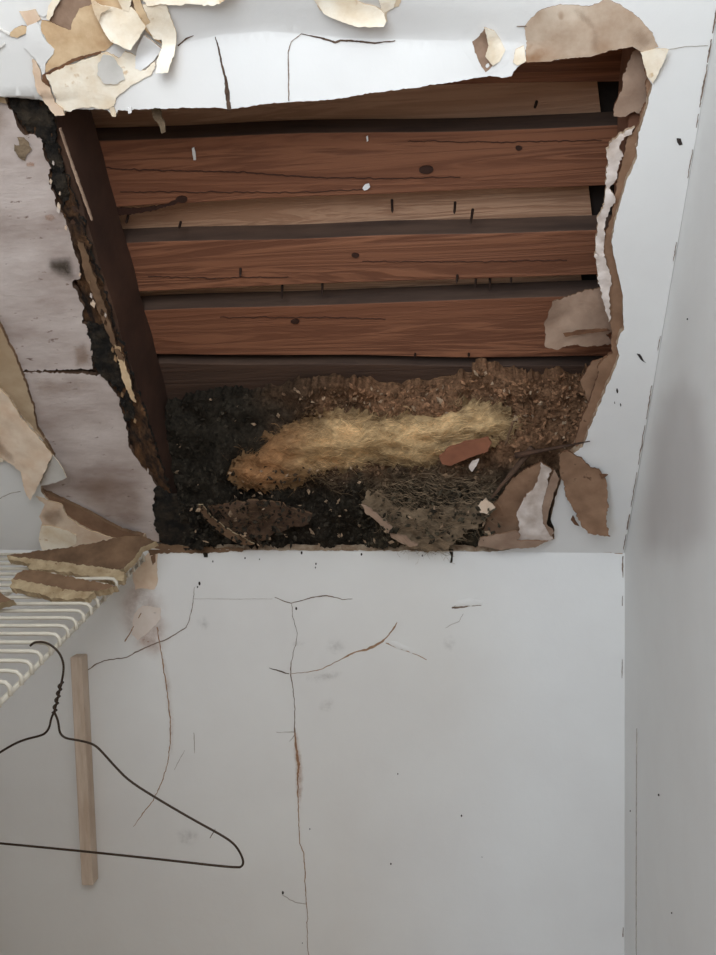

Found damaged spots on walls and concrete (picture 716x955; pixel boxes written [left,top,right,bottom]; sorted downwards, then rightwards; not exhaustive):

peeling [10,0,224,117]
crack [178,35,232,110]
crack [288,33,395,101]
peeling [314,0,401,27]
leakage [9,97,70,205]
leakage [51,261,70,274]
flaking render [472,0,669,447]
leakage [87,321,135,421]
peeling [0,390,113,551]
flaking render [132,543,244,590]
crack [88,587,195,827]
crack [270,595,427,955]